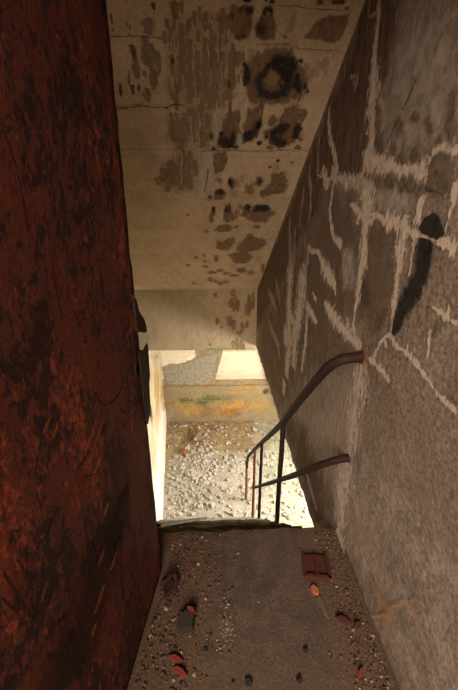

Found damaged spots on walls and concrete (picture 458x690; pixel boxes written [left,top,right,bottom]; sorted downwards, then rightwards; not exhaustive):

crack [116,103,181,111]
damp [118,0,458,552]
peeling [151,350,218,386]
rust [154,363,268,418]